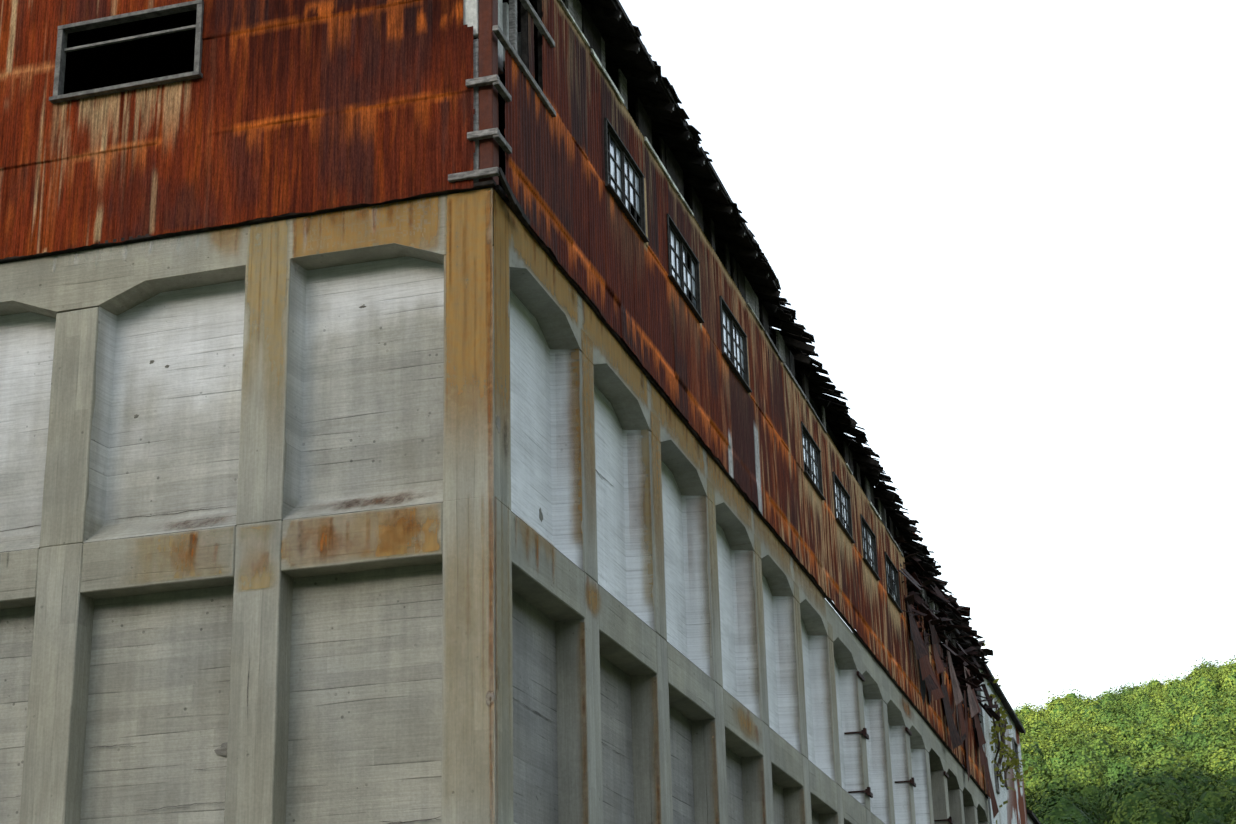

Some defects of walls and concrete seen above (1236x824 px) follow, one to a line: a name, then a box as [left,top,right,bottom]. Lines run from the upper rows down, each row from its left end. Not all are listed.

corrosion [245,188,790,598]